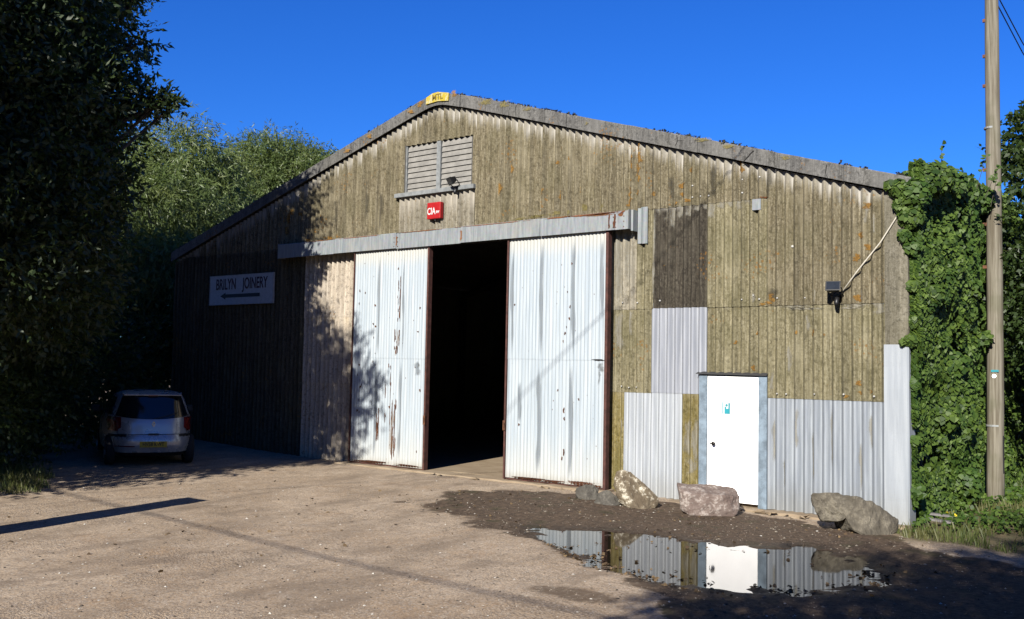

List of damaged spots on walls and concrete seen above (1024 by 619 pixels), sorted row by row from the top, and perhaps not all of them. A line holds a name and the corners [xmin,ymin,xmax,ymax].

corrosion [356,267,422,468]
corrosion [511,476,602,487]